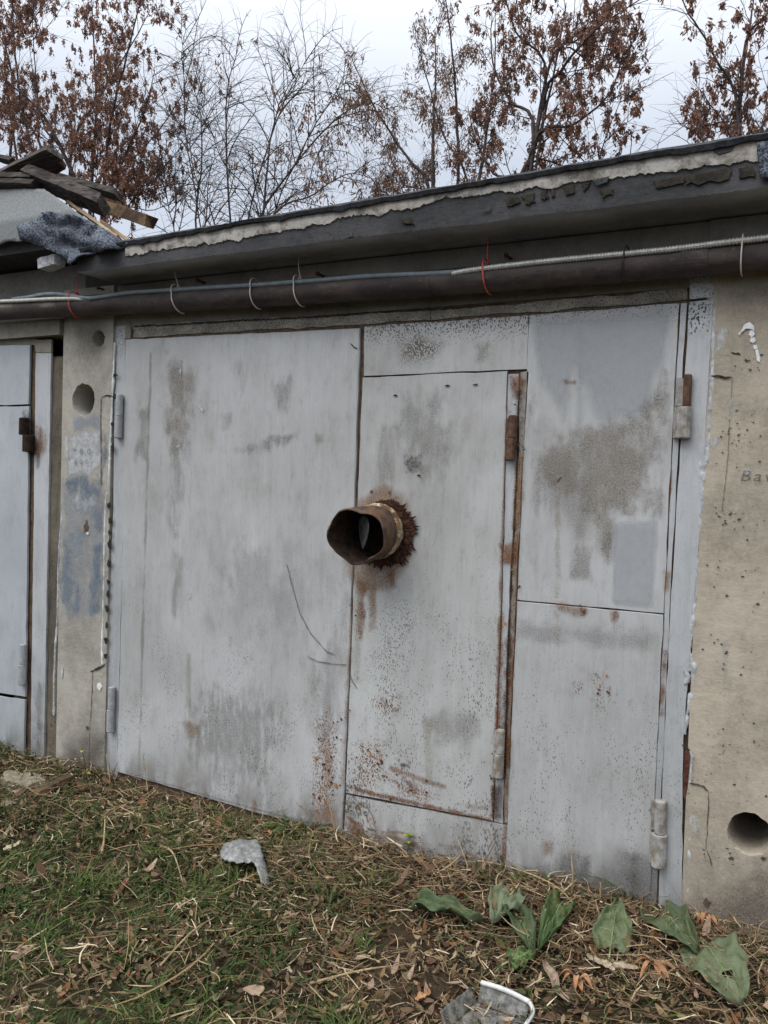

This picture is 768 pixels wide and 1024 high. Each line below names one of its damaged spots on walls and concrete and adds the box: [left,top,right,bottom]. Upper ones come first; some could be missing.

peeling [125,139,768,257]
corrosion [312,377,526,868]
crack [690,783,712,866]